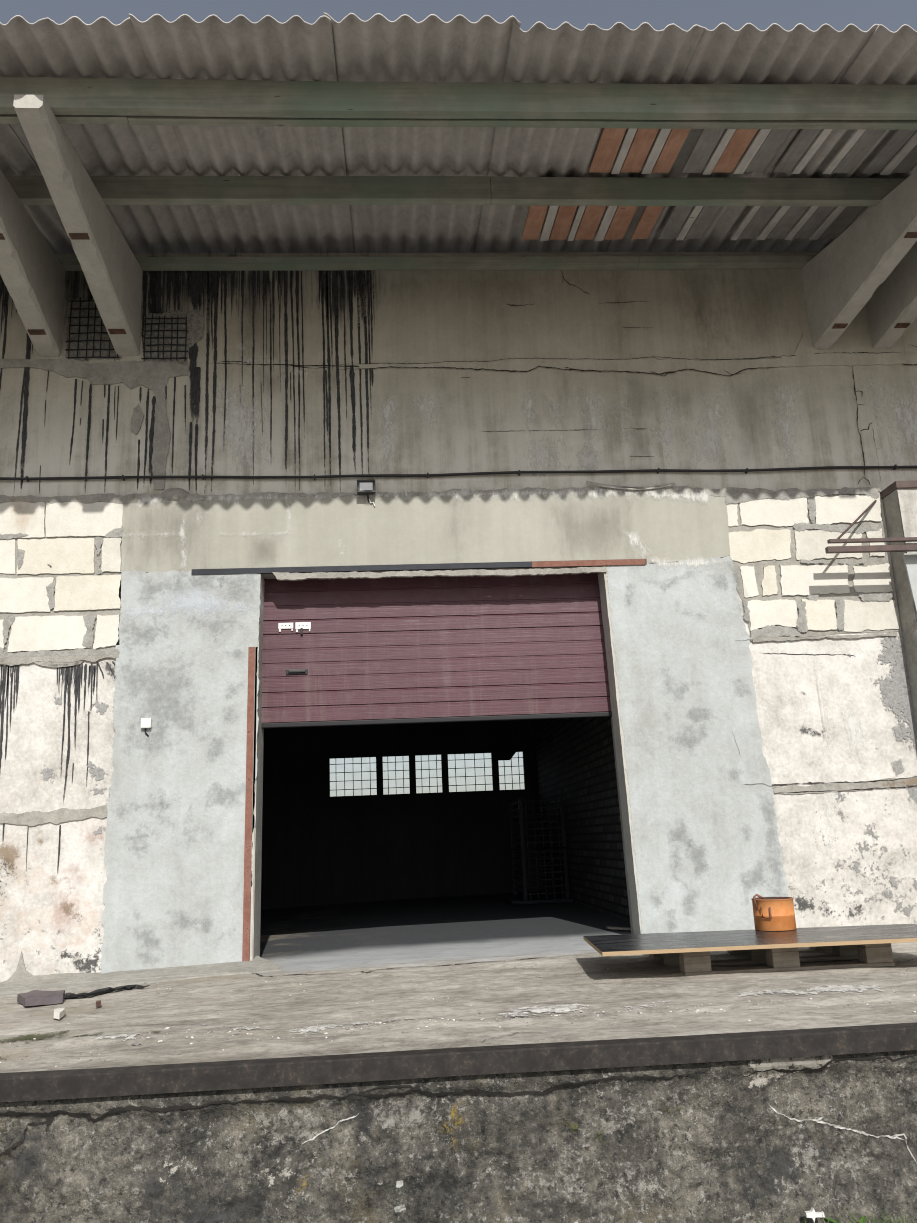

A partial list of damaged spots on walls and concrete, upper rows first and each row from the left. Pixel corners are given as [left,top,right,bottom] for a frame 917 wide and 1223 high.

water stain [0,275,17,389]
water stain [14,333,33,488]
water stain [66,271,93,300]
water stain [69,379,119,491]
water stain [137,253,305,494]
water stain [319,255,396,490]
crack [221,345,917,486]
crack [561,271,647,328]
water stain [0,665,19,769]
water stain [57,661,116,799]